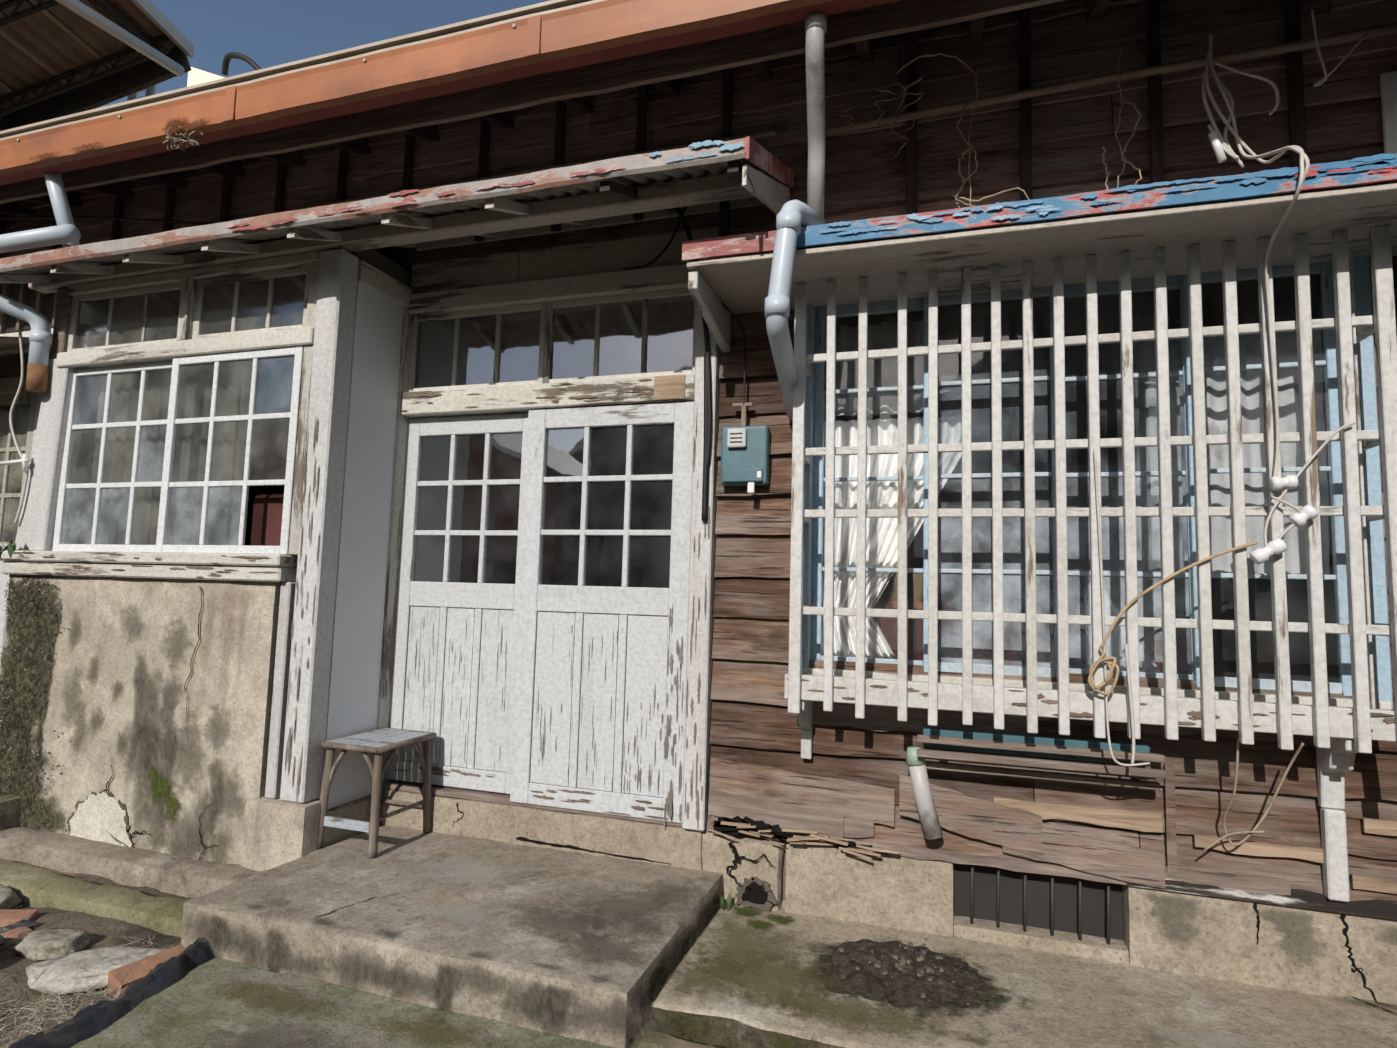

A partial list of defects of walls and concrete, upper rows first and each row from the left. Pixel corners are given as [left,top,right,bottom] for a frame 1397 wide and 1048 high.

corrosion [162,118,206,132]
peeling [648,140,744,162]
peeling [820,200,1061,235]
peeling [1080,153,1397,205]
water stain [0,583,101,788]
crack [170,586,202,732]
peeling [530,579,707,832]
spalling [67,758,152,848]
water stain [114,659,242,863]
crack [199,802,221,860]
crack [726,842,774,887]
crack [1340,914,1397,1014]